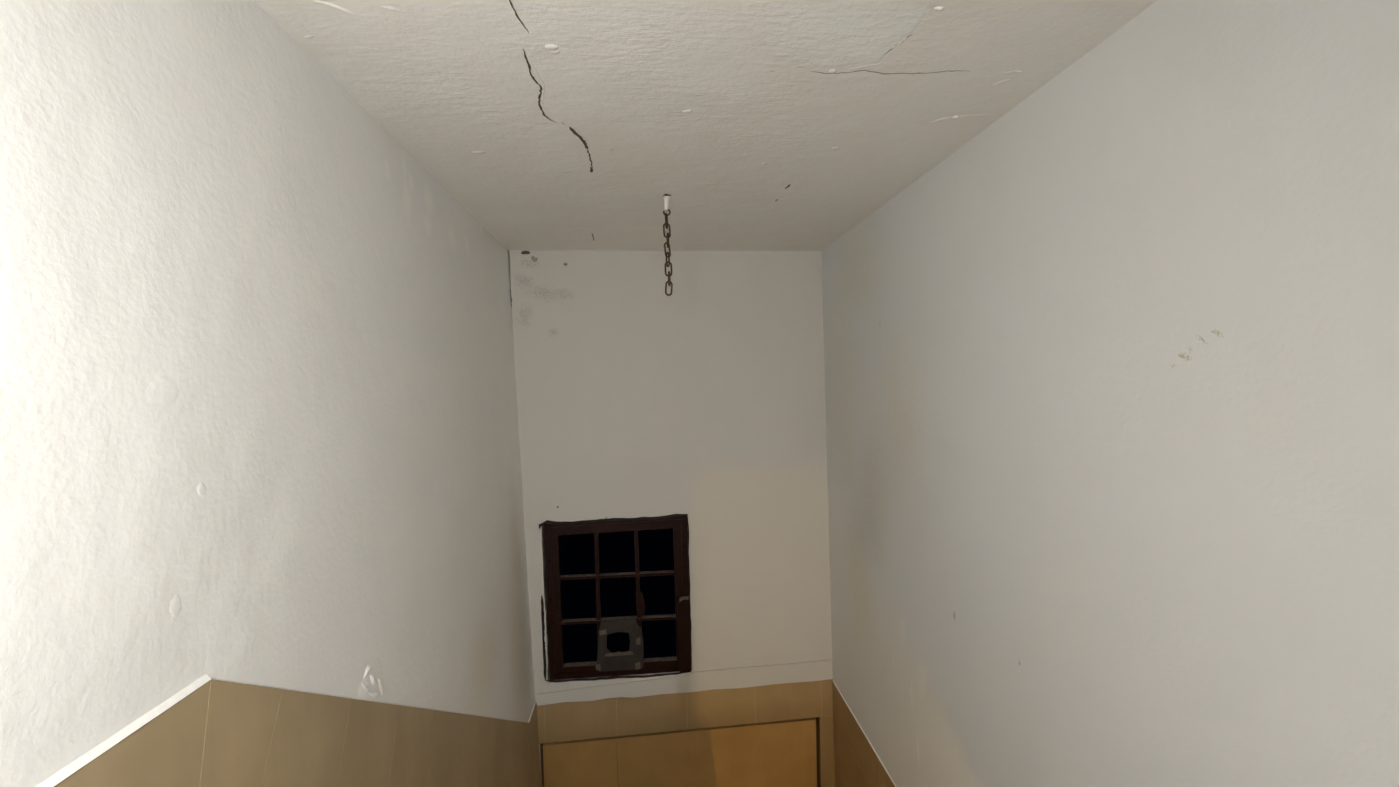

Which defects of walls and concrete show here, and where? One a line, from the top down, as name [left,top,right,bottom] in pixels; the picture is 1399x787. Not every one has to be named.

crack [508,0,599,172]
crack [773,34,959,74]